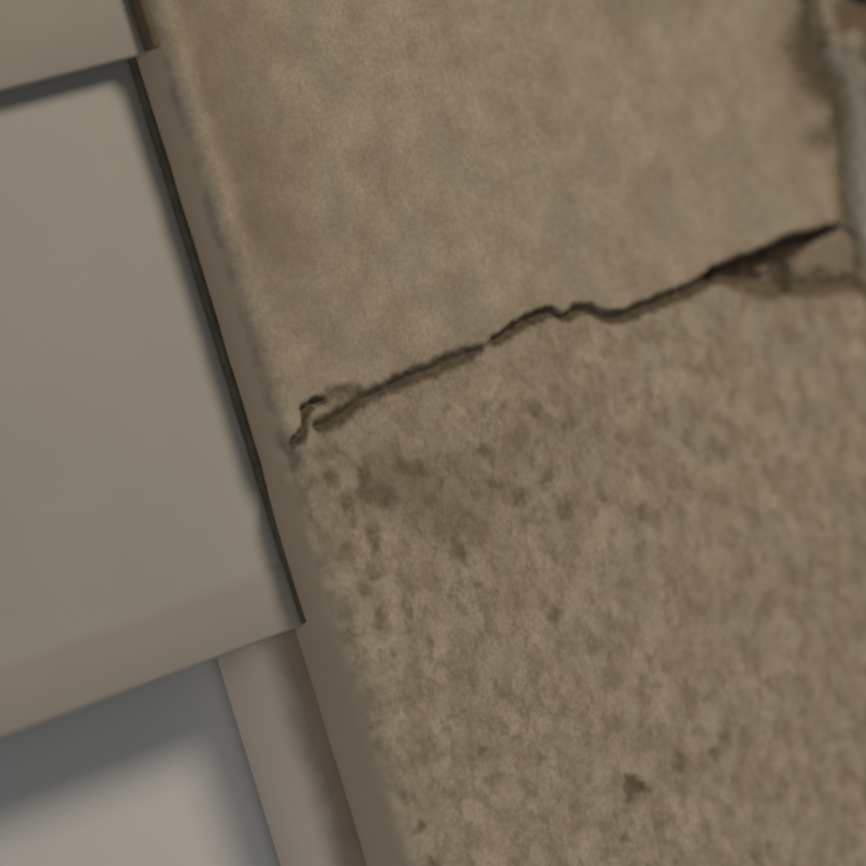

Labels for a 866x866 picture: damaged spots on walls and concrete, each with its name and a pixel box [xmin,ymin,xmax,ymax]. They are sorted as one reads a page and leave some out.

crack [290,0,866,449]